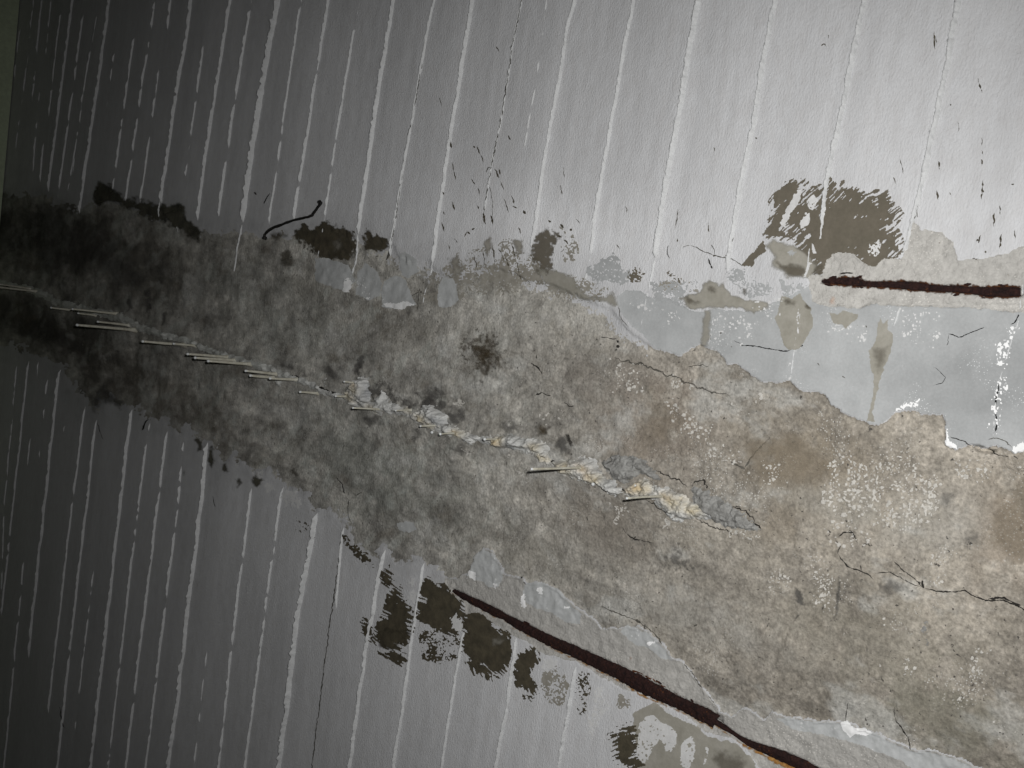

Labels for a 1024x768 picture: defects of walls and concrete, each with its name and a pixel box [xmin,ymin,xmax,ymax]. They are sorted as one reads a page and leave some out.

water stain [94,183,200,240]
water stain [767,240,822,278]
corrosion [822,275,1021,299]
crack [584,297,728,395]
spalling [0,161,1024,768]
crack [658,471,708,488]
crack [731,437,770,469]
crack [647,500,761,535]
crack [836,531,1024,610]
corrosion [452,589,819,768]